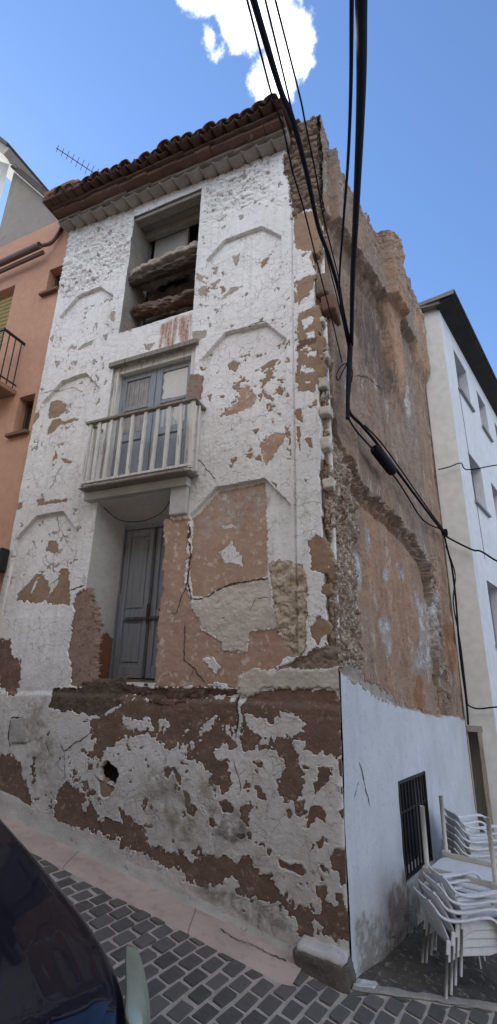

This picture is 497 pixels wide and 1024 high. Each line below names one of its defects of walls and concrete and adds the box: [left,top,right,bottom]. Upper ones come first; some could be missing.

peeling [0,115,428,942]
crack [170,523,270,682]